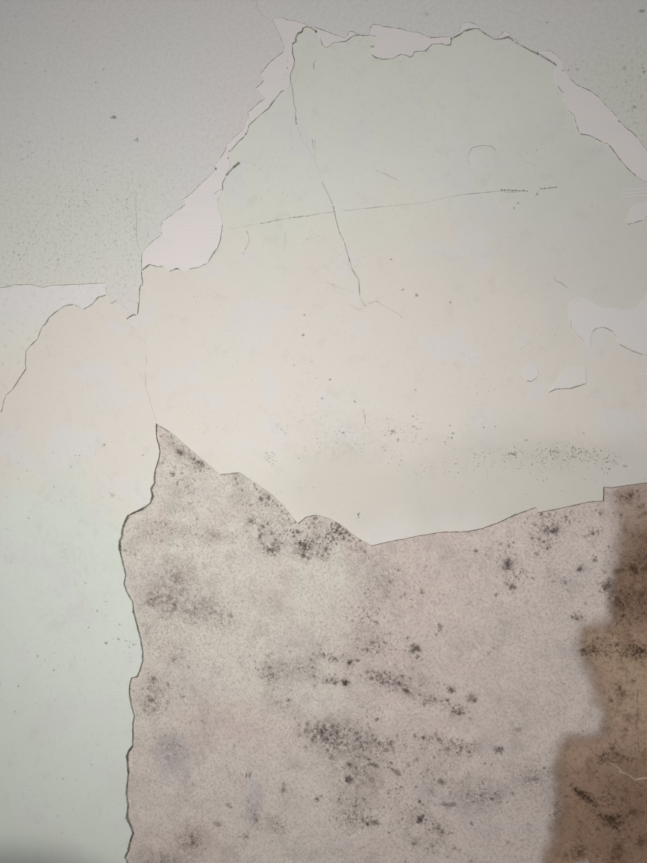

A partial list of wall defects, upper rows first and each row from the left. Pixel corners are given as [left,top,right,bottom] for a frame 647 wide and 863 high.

peeling [141,18,317,272]
peeling [369,24,451,60]
peeling [538,51,647,182]
flaking render [121,424,647,863]
water stain [546,486,647,863]